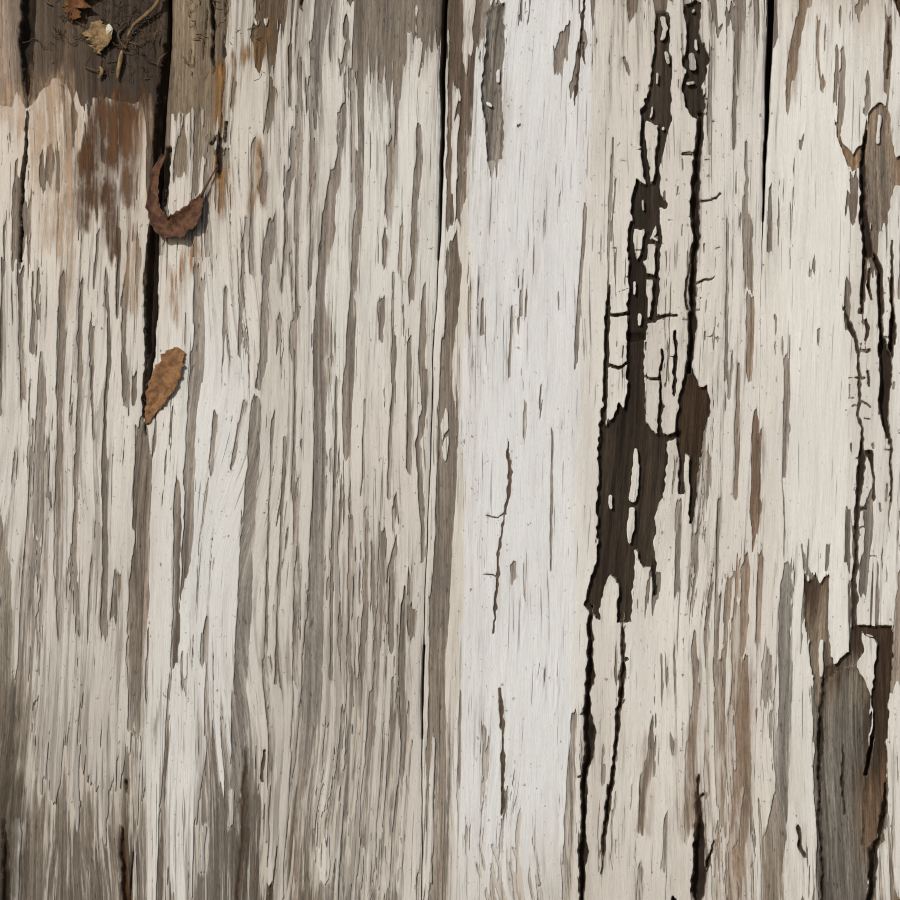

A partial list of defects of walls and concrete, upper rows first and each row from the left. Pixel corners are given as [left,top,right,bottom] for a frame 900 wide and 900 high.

crack [152,45,169,167]
peeling [481,4,506,162]
crack [142,225,155,436]
peeling [584,1,711,622]
crack [843,131,897,626]
crack [578,604,629,900]
peeling [804,573,894,900]